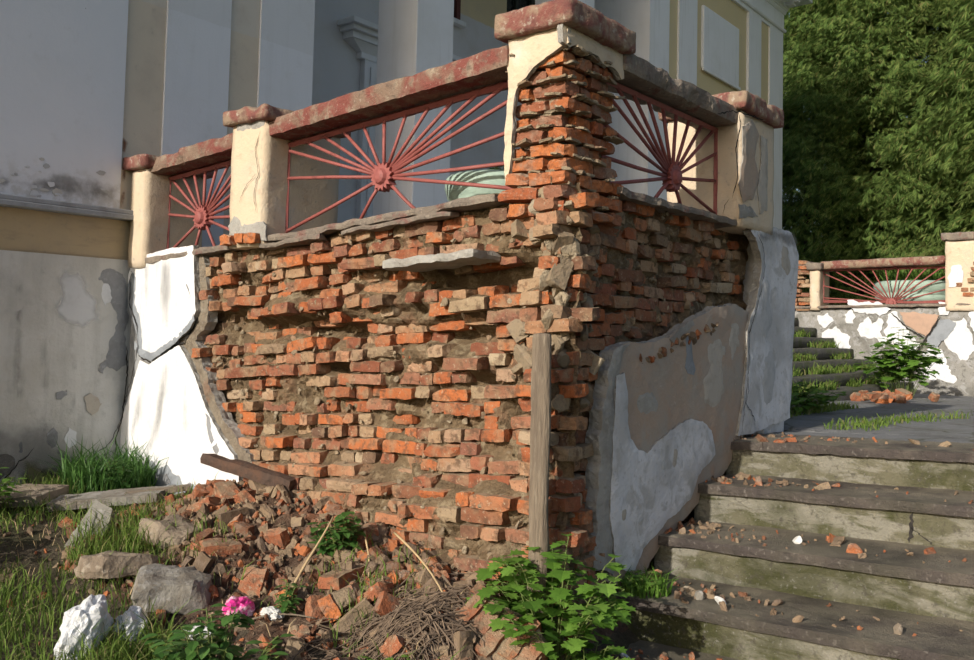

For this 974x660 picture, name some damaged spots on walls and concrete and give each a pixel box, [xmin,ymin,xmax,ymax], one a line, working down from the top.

peeling [738,121,768,219]
crack [97,271,198,454]
flaking render [191,47,742,610]
flaking render [703,237,773,407]
peeling [817,300,974,384]
spalling [947,262,974,297]
crack [907,512,932,545]